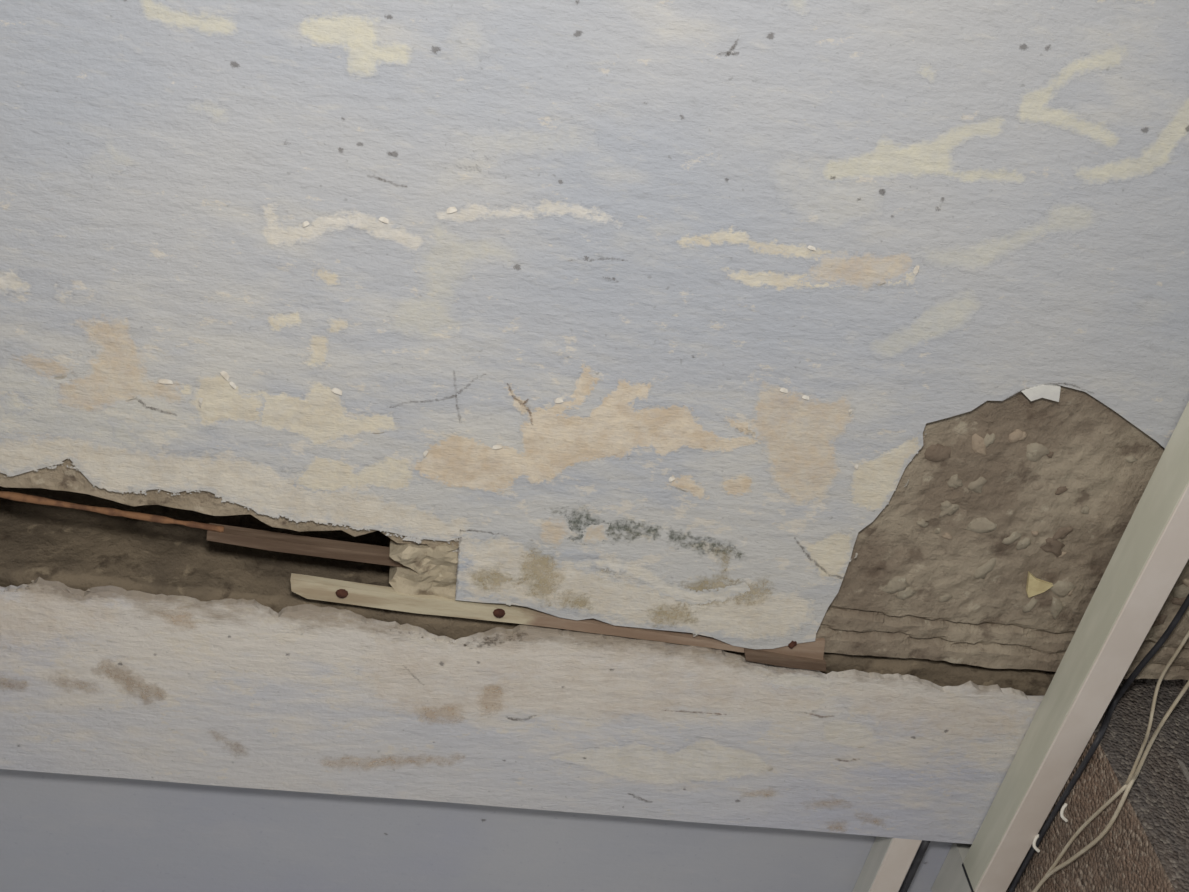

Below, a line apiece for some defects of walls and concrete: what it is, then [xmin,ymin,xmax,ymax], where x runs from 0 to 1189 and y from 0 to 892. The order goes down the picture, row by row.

peeling [138,0,239,39]
peeling [674,224,921,295]
rust [0,491,224,532]
spalling [0,310,1165,725]
water stain [569,512,741,563]
spalling [1123,559,1189,680]